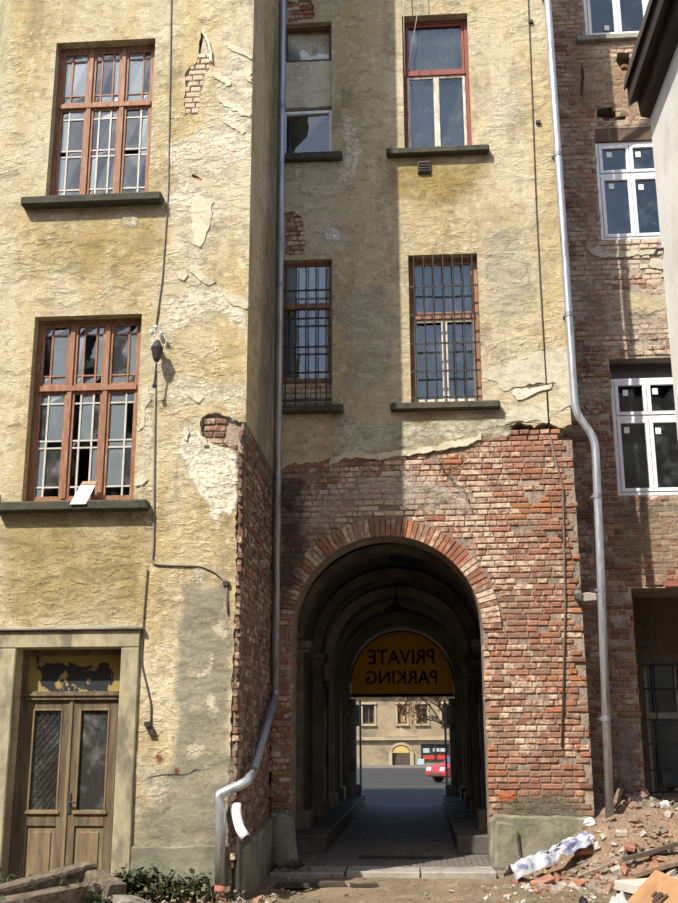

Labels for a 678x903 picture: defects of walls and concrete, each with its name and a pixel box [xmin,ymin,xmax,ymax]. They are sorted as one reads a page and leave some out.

spalling [287,0,315,26]
peeling [589,245,662,258]
flaking render [135,30,594,899]
peeling [474,844,650,903]